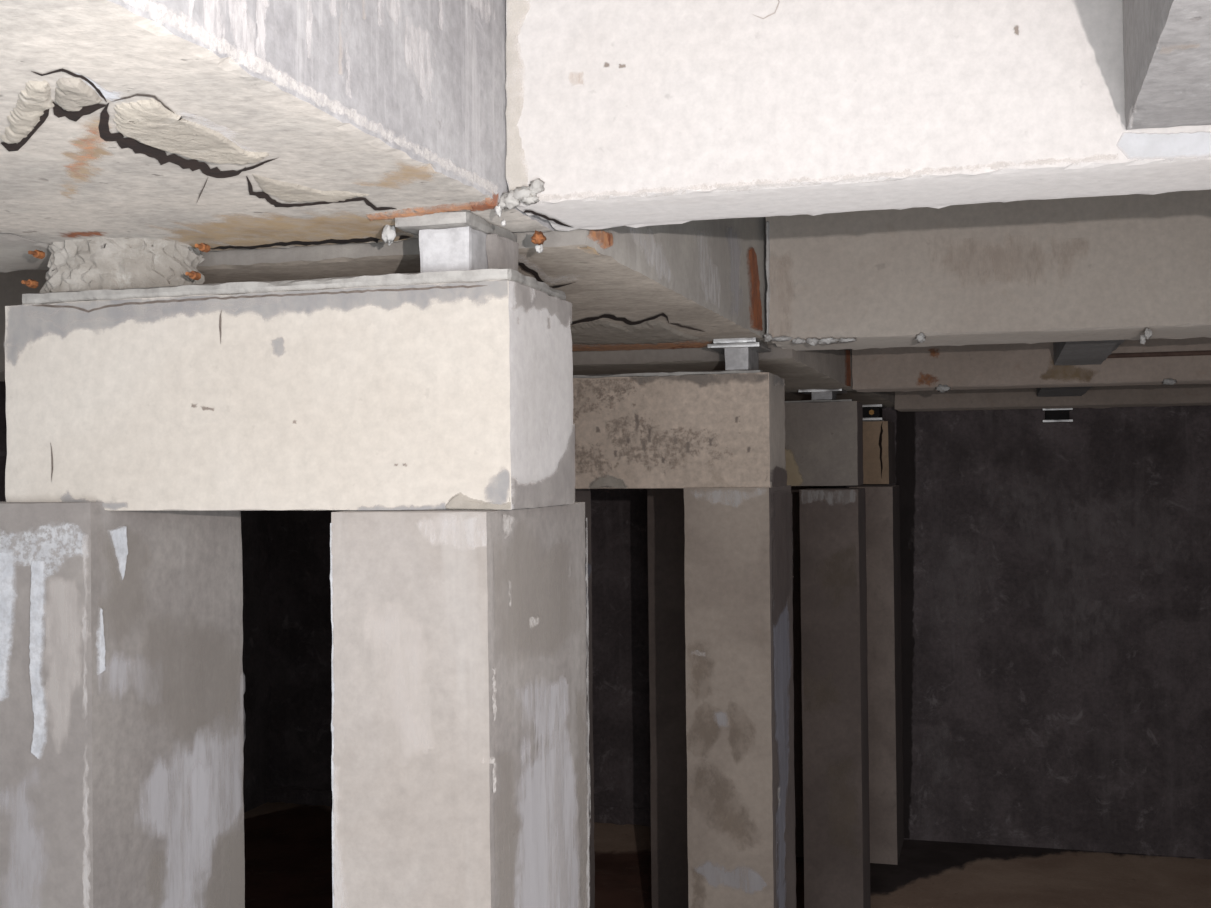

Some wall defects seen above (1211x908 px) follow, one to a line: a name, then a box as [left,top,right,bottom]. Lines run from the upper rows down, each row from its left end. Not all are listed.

crack [1,68,410,250]
corrosion [363,165,432,187]
corrosion [366,193,498,221]
crack [518,262,575,288]
crack [570,313,704,332]
corrosion [748,247,763,331]
leakage [0,523,86,759]
leakage [97,526,148,693]
leakage [496,425,575,653]
leakage [483,686,652,908]